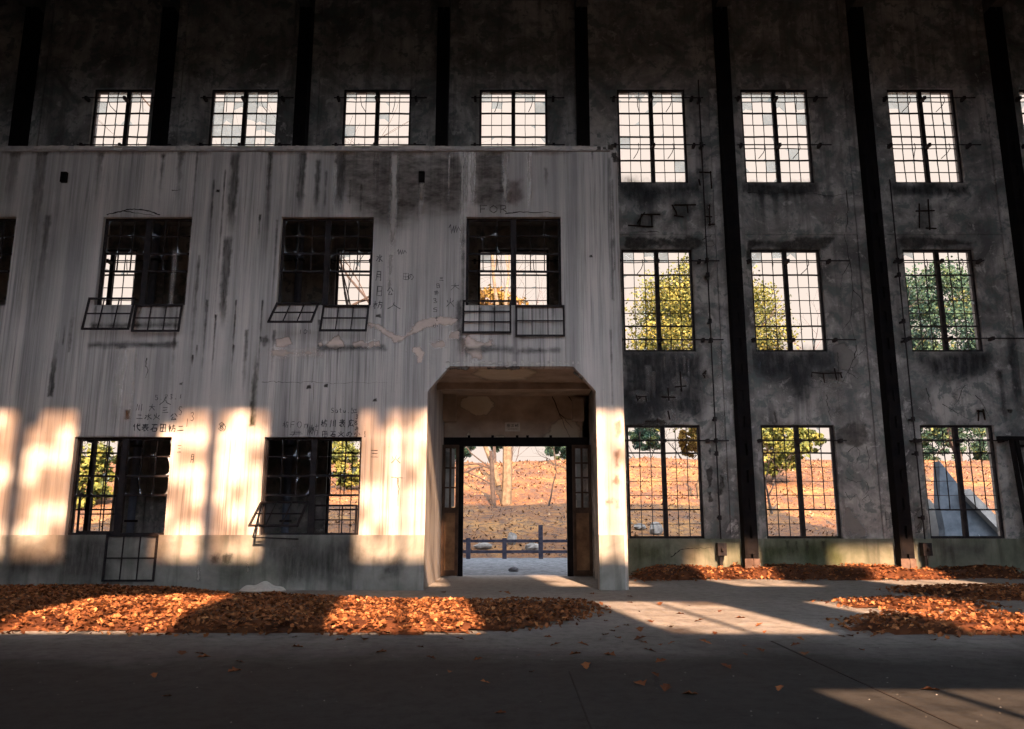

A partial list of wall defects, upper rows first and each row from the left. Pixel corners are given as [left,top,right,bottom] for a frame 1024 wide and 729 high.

leakage [211,155,238,216]
leakage [297,154,320,199]
leakage [334,152,529,277]
leakage [205,240,247,349]
leakage [318,320,386,350]
peeling [319,314,583,380]